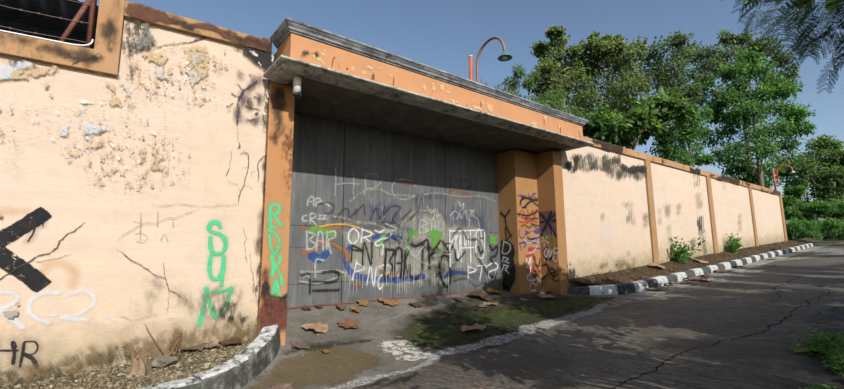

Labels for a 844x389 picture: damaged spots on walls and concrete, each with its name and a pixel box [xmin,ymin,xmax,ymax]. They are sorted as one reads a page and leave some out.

crack [0,222,85,280]
peeling [0,44,232,191]
crack [118,74,266,321]
water stain [567,153,647,180]
crack [611,275,836,389]